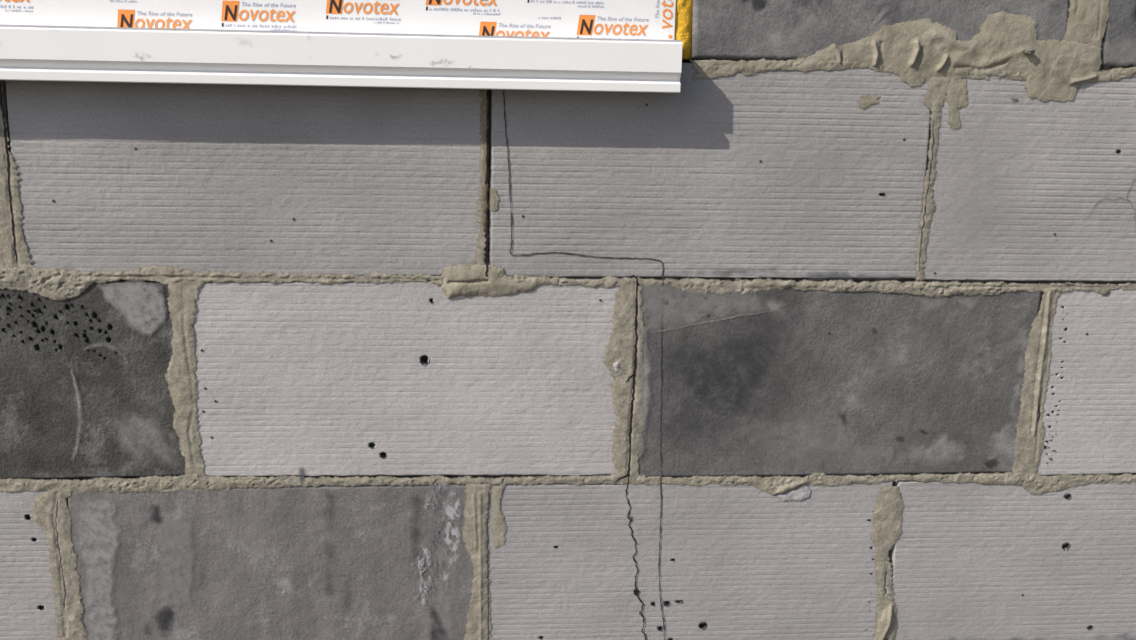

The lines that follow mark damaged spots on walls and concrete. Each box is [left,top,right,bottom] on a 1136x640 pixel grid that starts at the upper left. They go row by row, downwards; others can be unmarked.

crack [0,82,17,263]
crack [919,120,934,270]
crack [503,91,665,640]
damp [429,490,461,640]